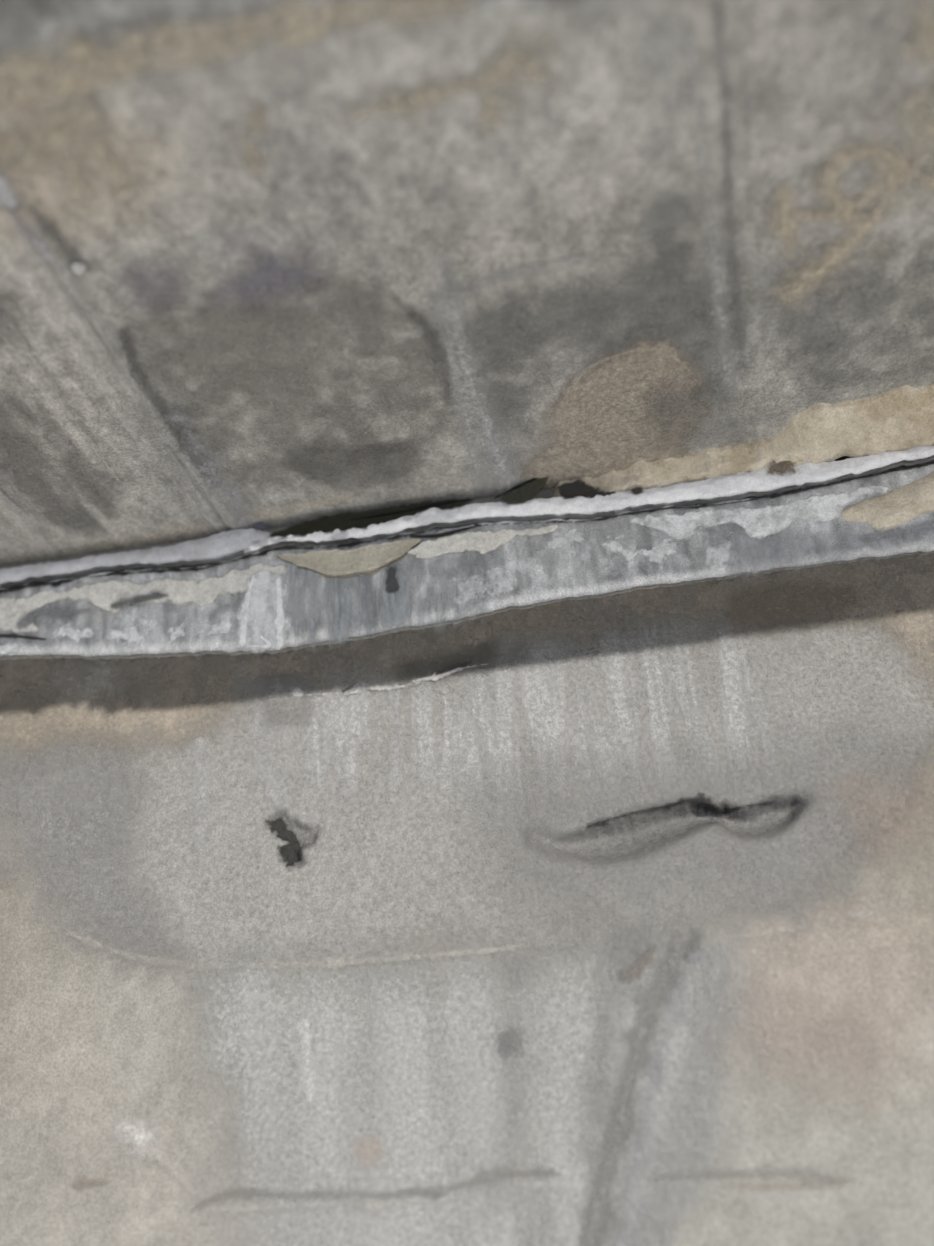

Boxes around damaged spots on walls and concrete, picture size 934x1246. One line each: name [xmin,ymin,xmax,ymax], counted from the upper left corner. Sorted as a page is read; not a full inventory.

water stain [120,253,449,530]
crack [0,462,934,594]
spalling [494,477,548,504]
peeling [602,486,888,571]
peeling [0,524,584,655]
crack [0,633,46,641]
peeling [292,662,487,697]
water stain [0,523,934,787]
spalling [266,814,317,866]
water stain [207,933,739,1246]
crack [366,1169,560,1209]